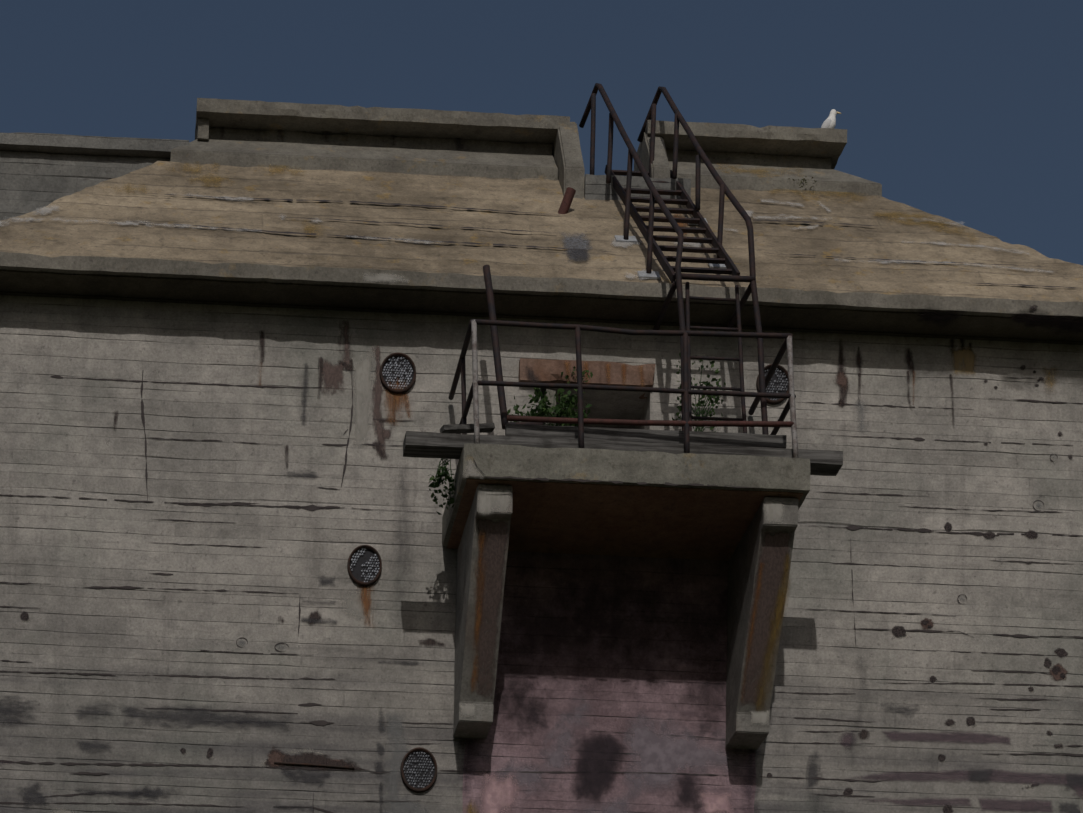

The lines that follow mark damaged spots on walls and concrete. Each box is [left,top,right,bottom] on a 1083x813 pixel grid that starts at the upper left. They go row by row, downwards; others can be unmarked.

corrosion [836,343,862,406]
leakage [476,489,510,697]
leakage [468,766,540,813]
leakage [585,718,731,813]